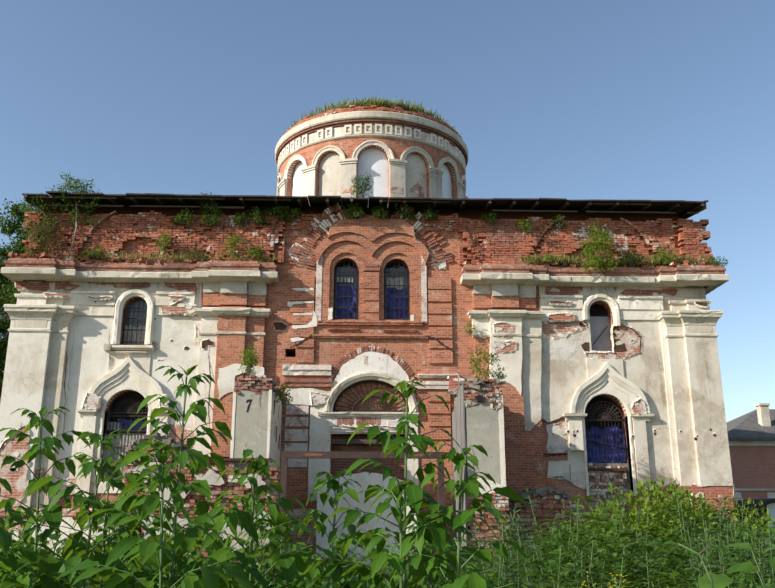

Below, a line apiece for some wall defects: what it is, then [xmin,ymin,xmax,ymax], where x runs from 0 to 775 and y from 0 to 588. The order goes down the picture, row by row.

flaking render [154,283,215,352]
flaking render [489,321,518,355]
flaking render [542,286,588,340]
flaking render [581,322,642,361]
flaking render [546,422,580,453]
flaking render [0,423,49,508]